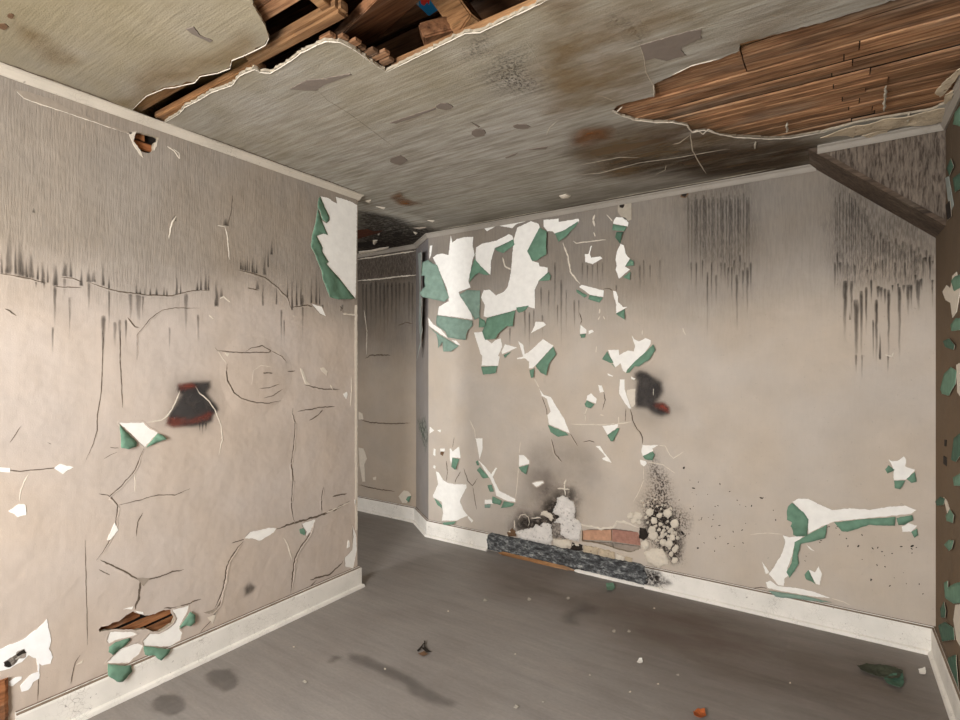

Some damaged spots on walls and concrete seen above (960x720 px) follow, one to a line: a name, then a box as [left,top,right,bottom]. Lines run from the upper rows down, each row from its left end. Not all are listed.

water stain [1,261,110,293]
crack [0,274,230,517]
crack [216,345,271,362]
peeling [311,195,389,569]
peeling [417,217,581,446]
water stain [844,275,933,328]
crack [85,448,189,609]
crack [200,367,410,633]
flaking render [505,495,641,562]
water stain [627,469,694,568]
peeling [750,497,918,605]
spalling [99,599,200,682]